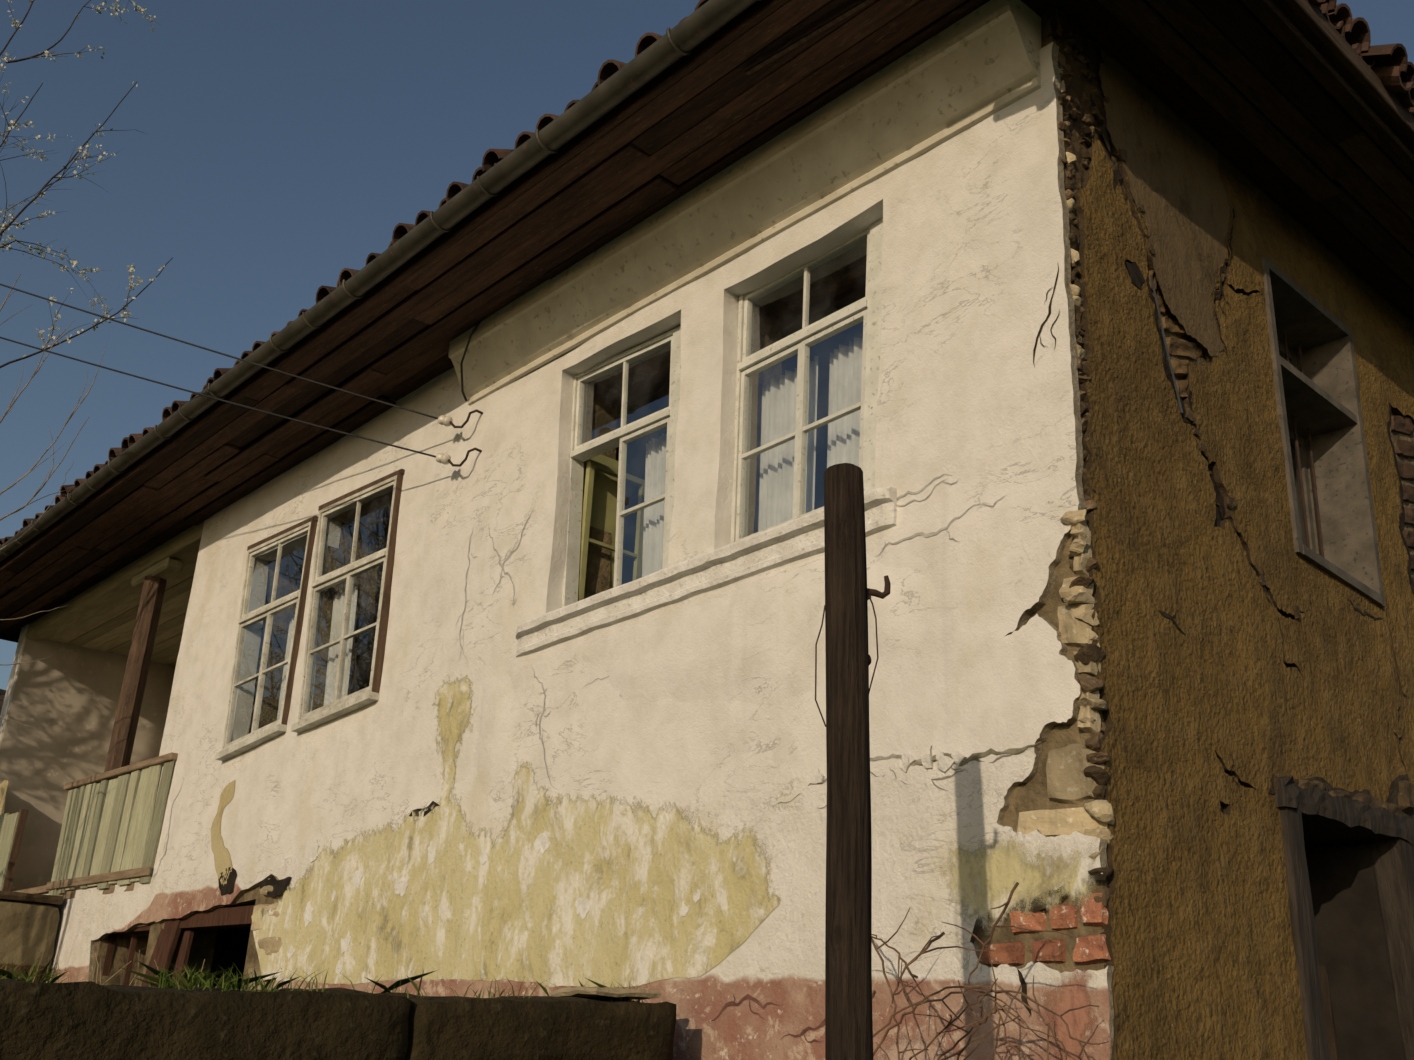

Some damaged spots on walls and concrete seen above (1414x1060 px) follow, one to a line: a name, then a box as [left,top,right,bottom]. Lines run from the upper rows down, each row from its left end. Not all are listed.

crack [1076,39,1155,255]
crack [1033,266,1060,367]
crack [1213,238,1253,317]
crack [876,474,1006,556]
flaking render [970,16,1235,1060]
crack [1185,408,1301,619]
flaking render [1387,403,1414,594]
crack [1347,598,1383,620]
crack [772,768,827,808]
crack [870,741,1041,791]
crack [1225,756,1245,787]
damp [949,840,1095,924]